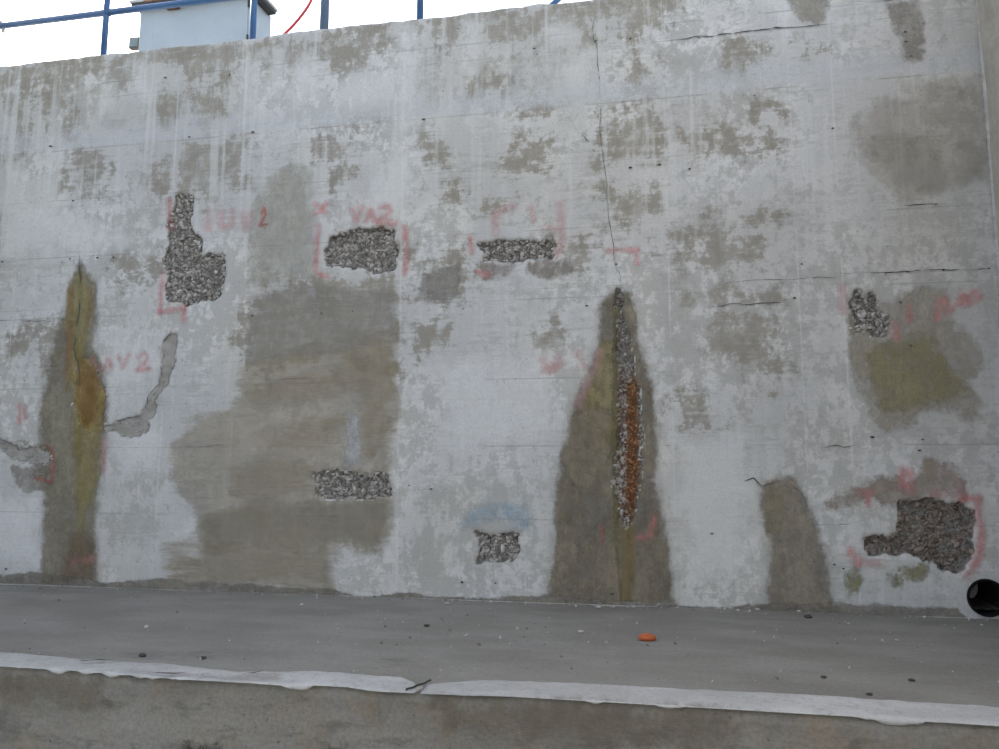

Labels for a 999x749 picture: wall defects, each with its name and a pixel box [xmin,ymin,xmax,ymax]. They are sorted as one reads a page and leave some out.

spalling [162,194,227,305]
spalling [324,228,398,274]
spalling [477,237,556,263]
spalling [849,289,890,338]
leakage [0,265,353,596]
leakage [379,286,980,618]
spalling [314,469,392,501]
spalling [478,530,520,562]
spalling [863,499,976,572]